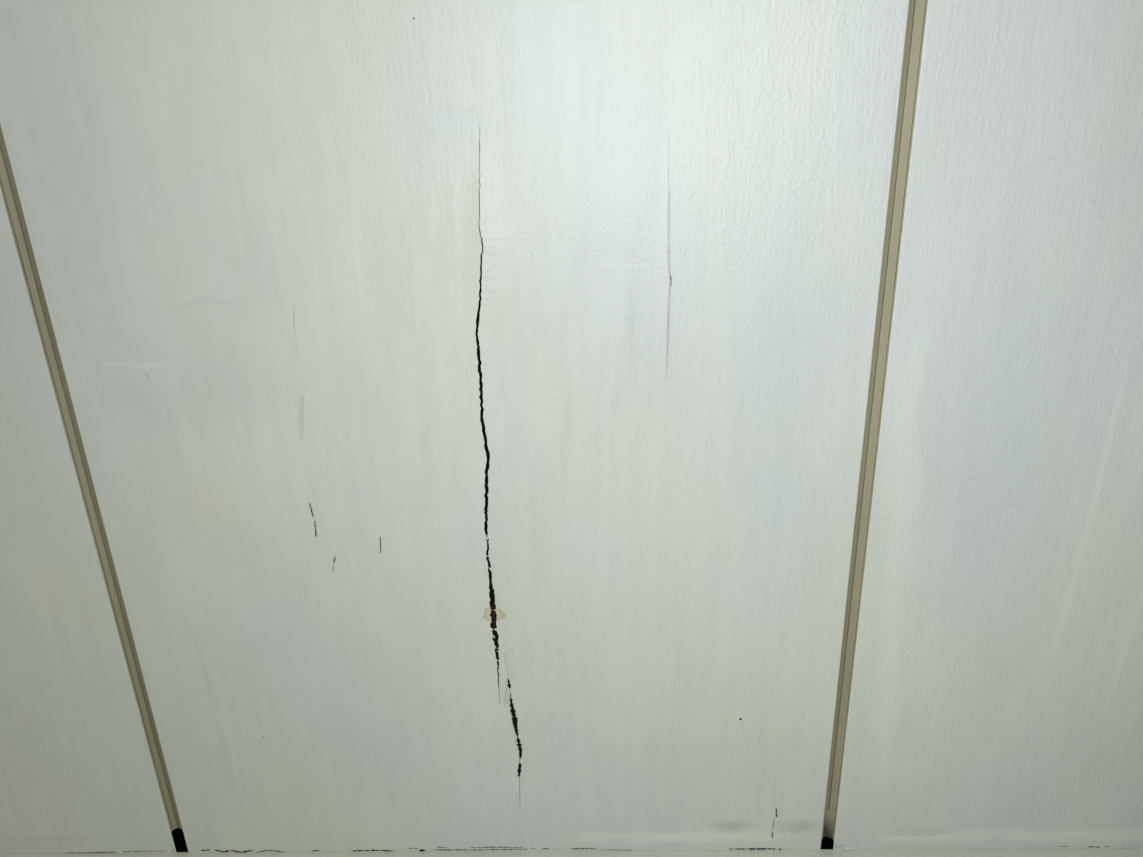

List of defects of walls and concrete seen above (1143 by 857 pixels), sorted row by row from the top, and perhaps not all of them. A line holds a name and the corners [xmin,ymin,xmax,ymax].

crack [475,132,522,793]